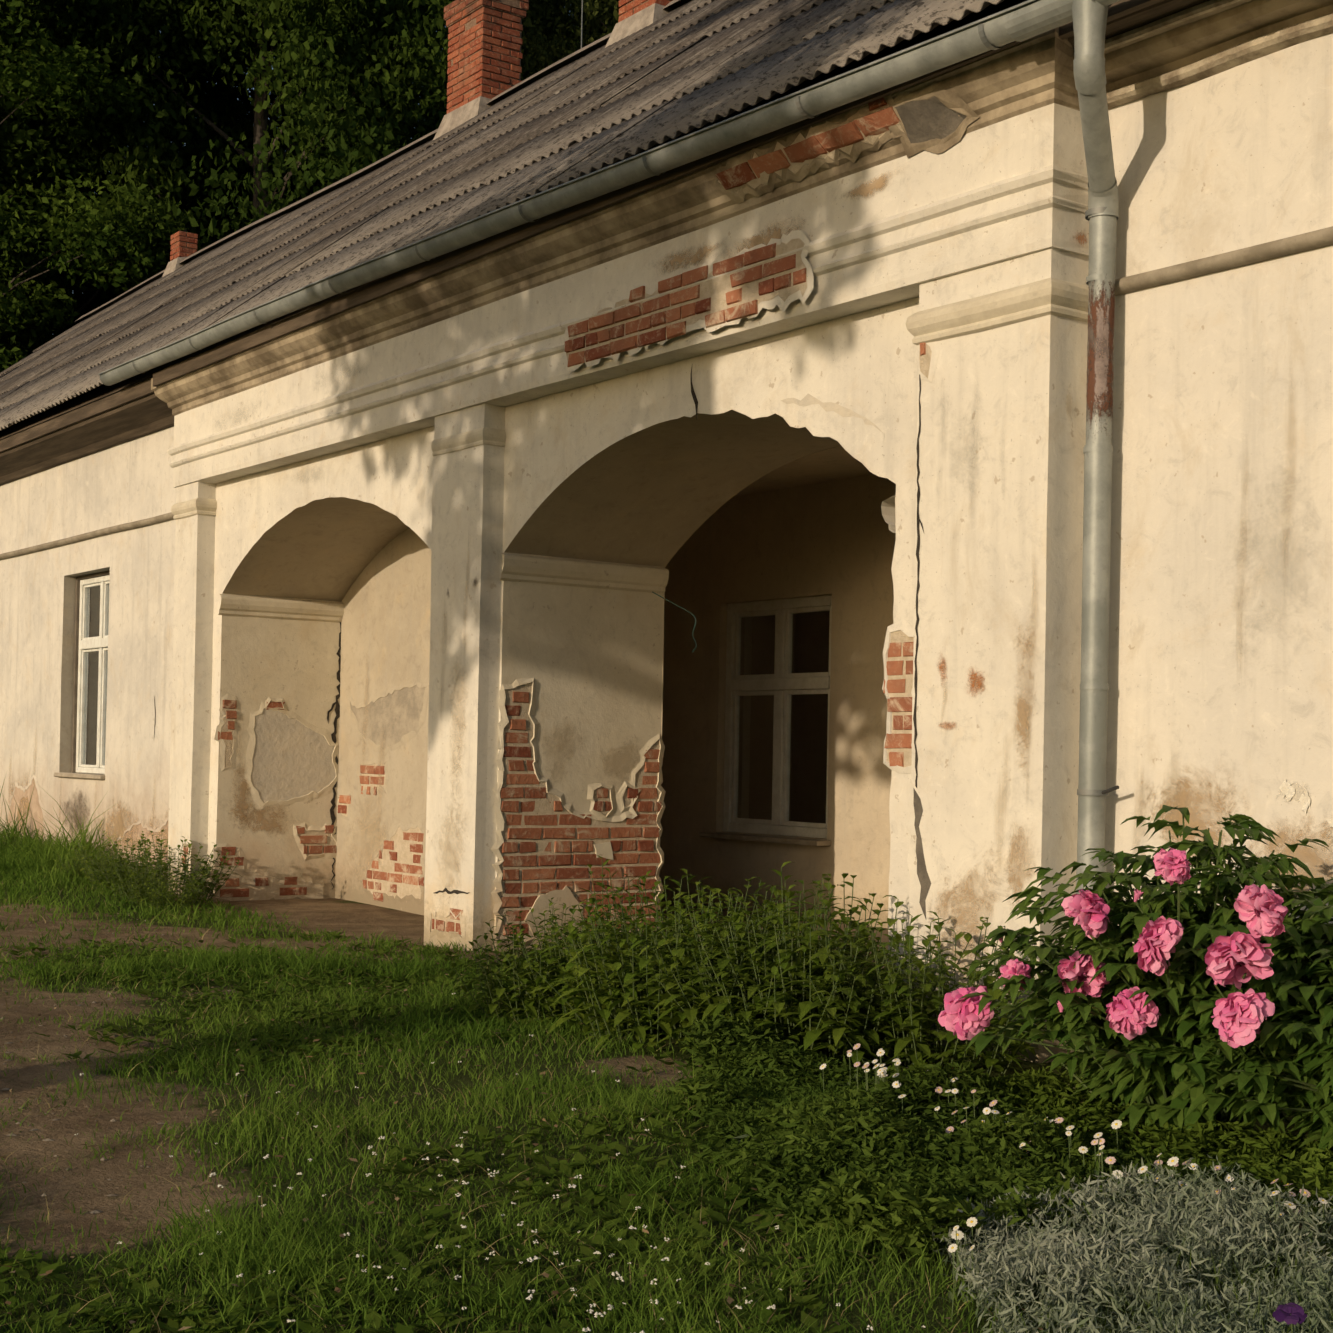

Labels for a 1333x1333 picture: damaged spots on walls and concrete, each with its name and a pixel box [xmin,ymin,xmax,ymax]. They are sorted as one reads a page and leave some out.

spalling [714,81,979,204]
spalling [564,230,814,371]
corrosion [1086,281,1115,429]
flaking render [211,679,429,901]
crack [327,622,341,889]
spalling [491,678,666,949]
spalling [882,619,941,930]
water stain [1159,780,1233,844]
water stain [1266,827,1333,892]